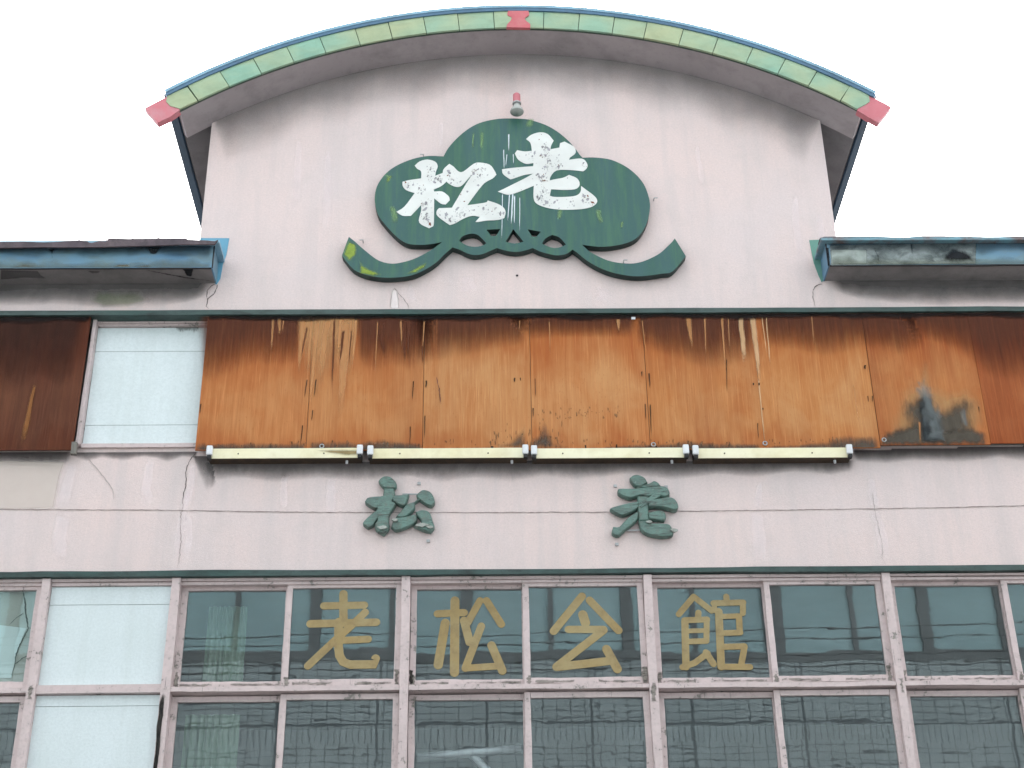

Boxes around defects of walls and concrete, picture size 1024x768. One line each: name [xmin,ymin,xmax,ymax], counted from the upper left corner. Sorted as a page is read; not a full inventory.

water stain [775,397,984,448]
crack [0,505,88,513]
crack [90,453,207,567]
crack [232,508,601,516]
crack [636,492,1024,565]